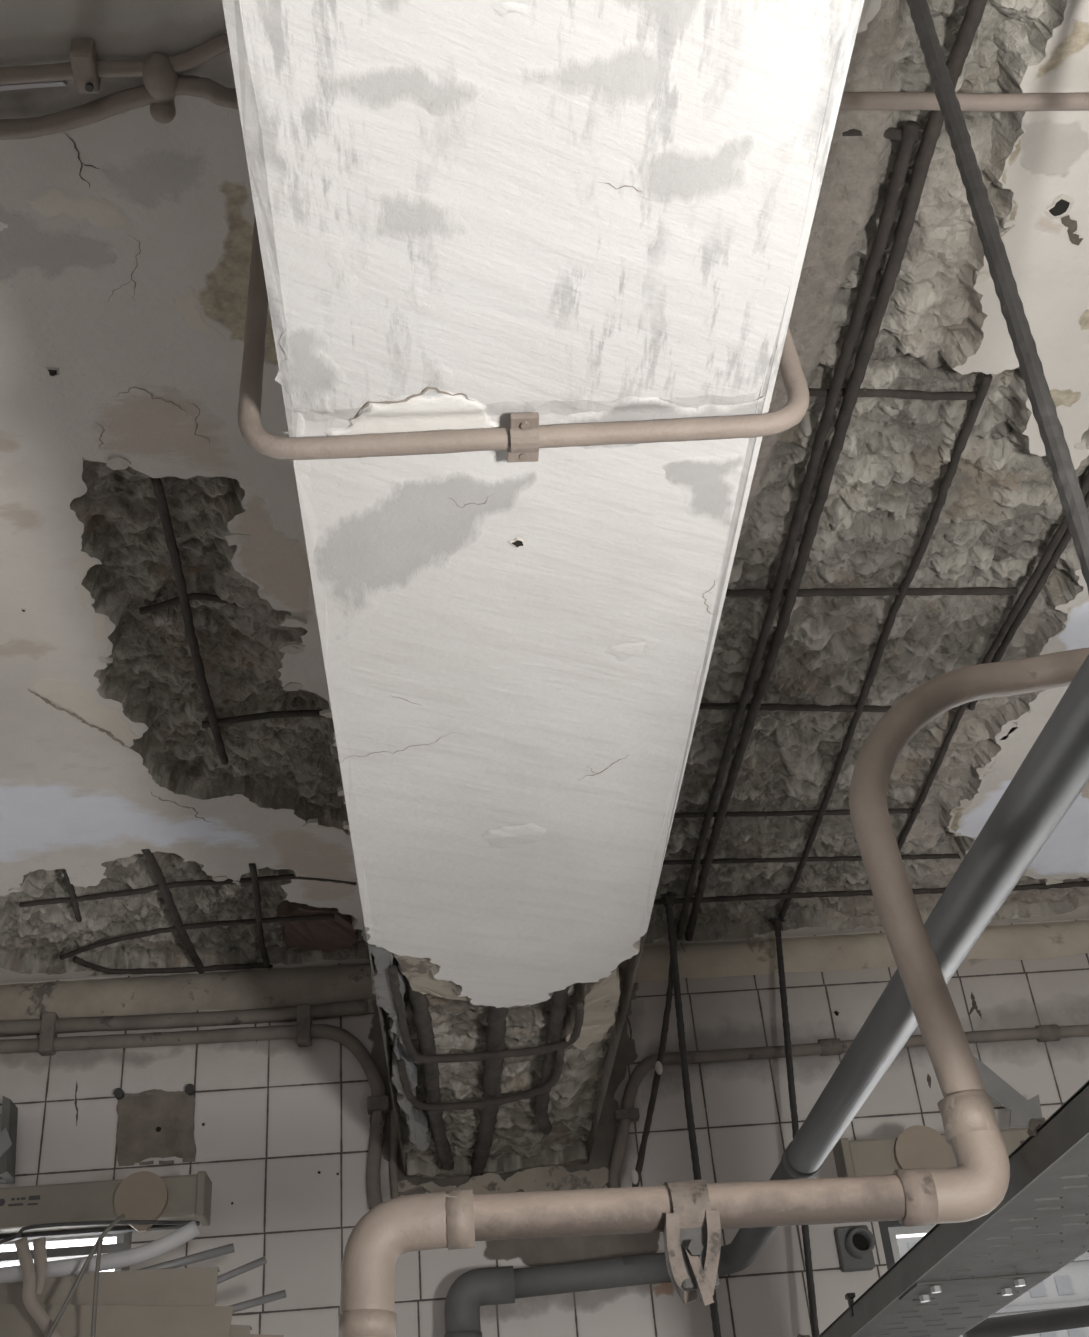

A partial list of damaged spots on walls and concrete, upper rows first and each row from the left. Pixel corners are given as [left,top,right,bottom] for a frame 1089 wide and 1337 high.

flaking render [0,0,227,67]
spalling [843,0,934,92]
spalling [926,0,1089,93]
crack [64,133,100,188]
crack [105,235,141,303]
spalling [0,110,1089,1178]